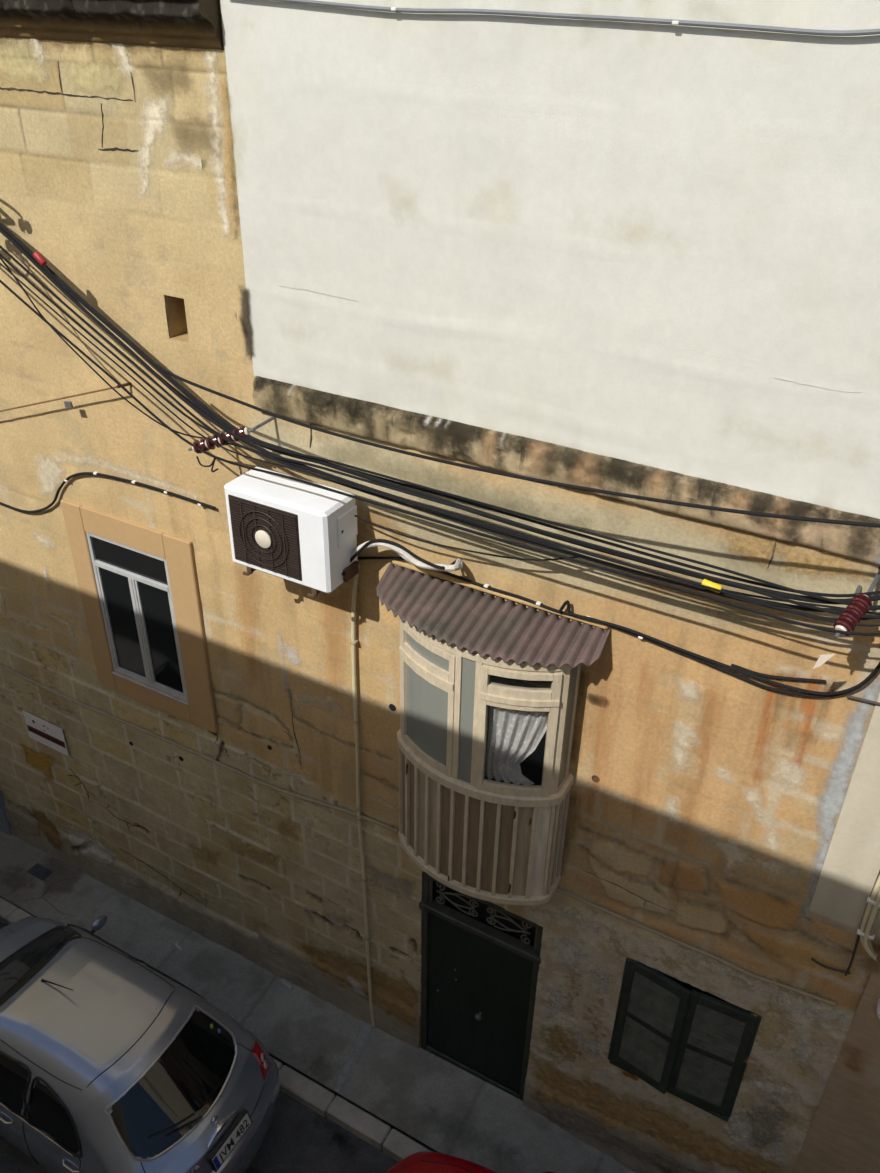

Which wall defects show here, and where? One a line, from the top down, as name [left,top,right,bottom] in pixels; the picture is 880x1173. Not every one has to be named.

damp [253,377,880,554]